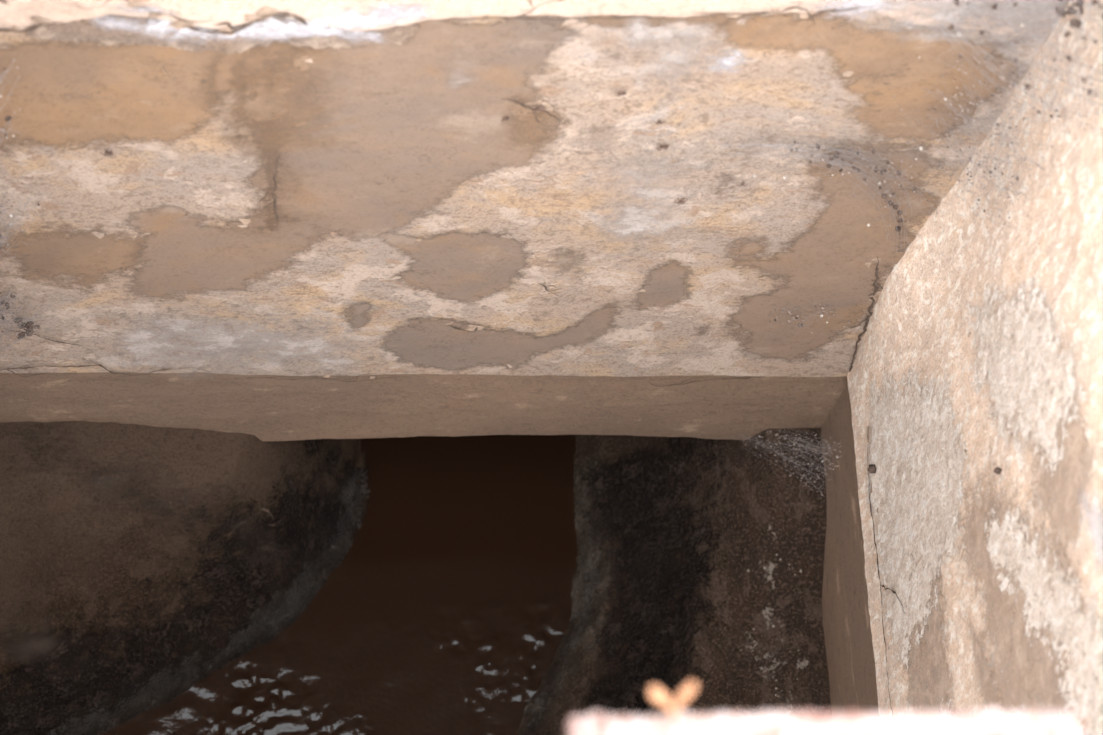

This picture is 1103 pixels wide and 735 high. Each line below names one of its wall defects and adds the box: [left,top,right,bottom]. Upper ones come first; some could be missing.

water stain [97,5,428,184]
crack [849,257,883,372]
water stain [0,439,370,735]
water stain [573,437,730,718]